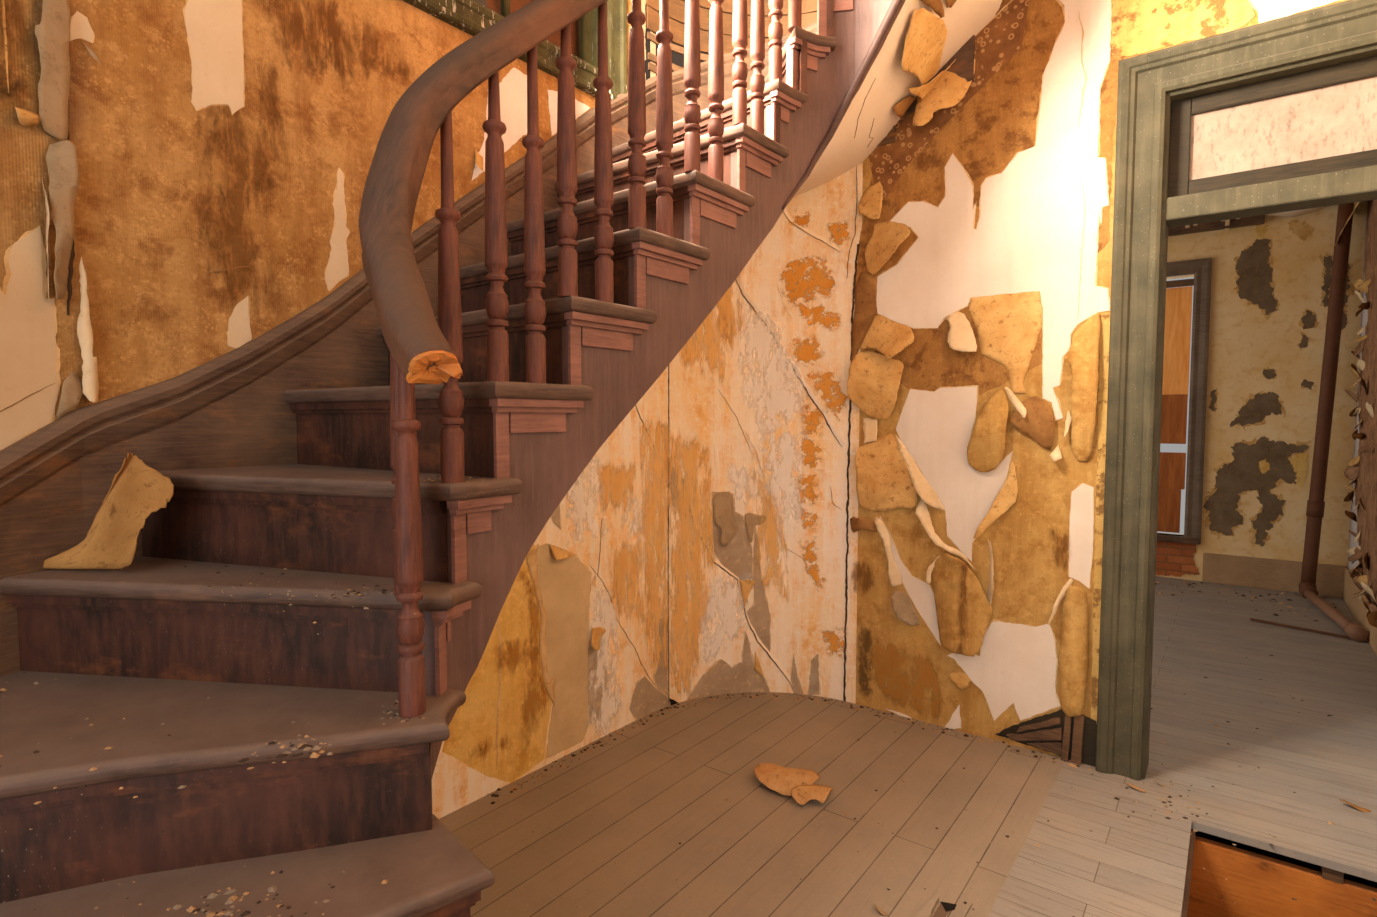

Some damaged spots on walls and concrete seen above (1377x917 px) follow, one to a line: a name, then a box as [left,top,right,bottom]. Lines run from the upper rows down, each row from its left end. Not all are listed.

flaking render [182,0,246,115]
flaking render [641,0,817,80]
flaking render [1248,0,1343,23]
crack [0,383,55,412]
flaking render [0,0,102,451]
flaking render [226,296,252,348]
flaking render [325,167,350,291]
flaking render [536,502,608,758]
crack [591,365,795,705]
crack [718,276,852,701]
crack [783,78,876,365]
flaking render [847,0,1112,729]